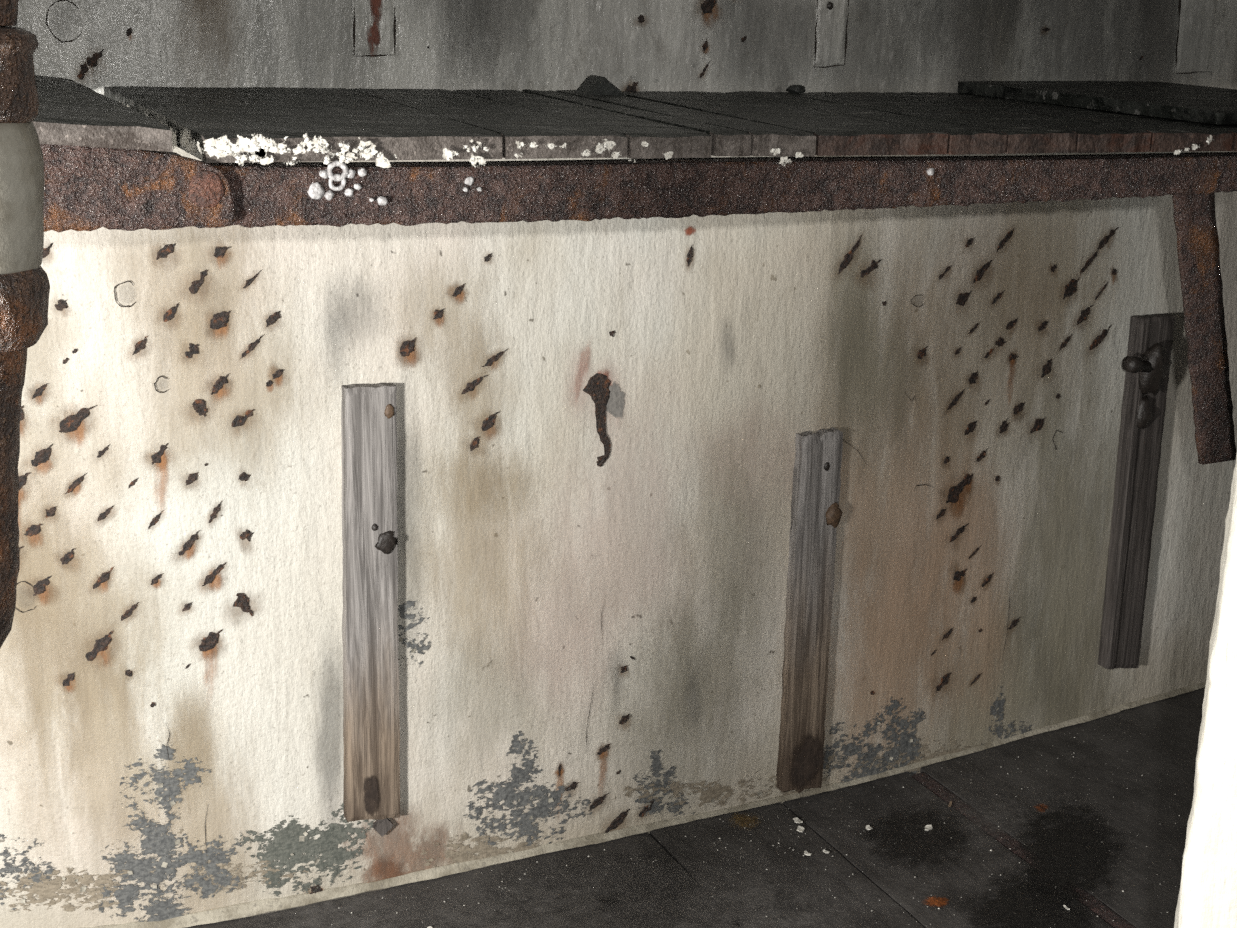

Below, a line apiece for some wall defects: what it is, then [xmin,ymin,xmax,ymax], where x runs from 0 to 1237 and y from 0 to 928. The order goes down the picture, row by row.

rust [368,0,382,54]
leakage [146,115,397,206]
peeling [822,686,1031,783]
peeling [0,745,375,922]
peeling [421,728,809,867]
leakage [971,806,1118,928]